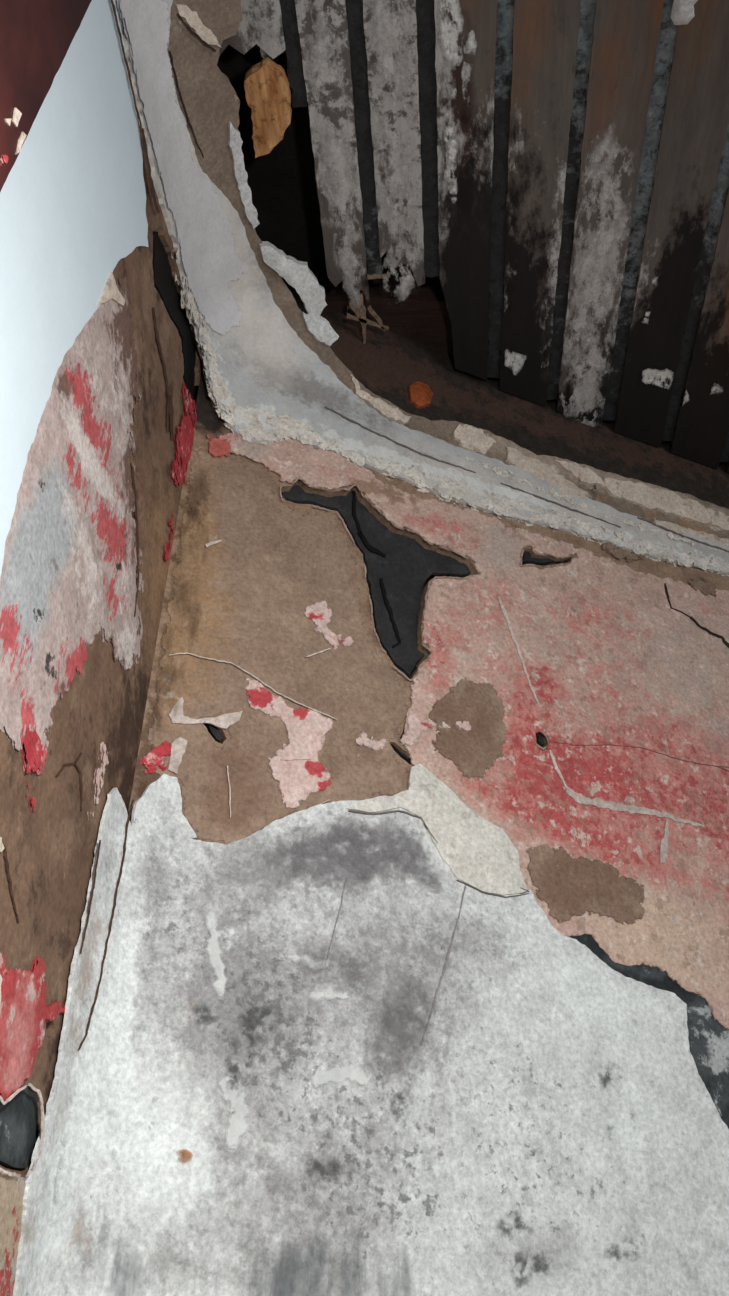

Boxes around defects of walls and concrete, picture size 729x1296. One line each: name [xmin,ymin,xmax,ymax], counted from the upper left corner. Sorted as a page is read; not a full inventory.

peeling [175,4,222,48]
efflorescence [439,0,476,96]
efflorescence [373,0,416,296]
efflorescence [562,136,627,425]
efflorescence [505,350,525,374]
efflorescence [643,369,673,386]
peeling [0,272,144,820]
peeling [140,232,729,1129]
crack [664,583,729,648]
crack [325,878,348,965]
crack [420,885,466,1045]
peeling [0,953,65,1177]